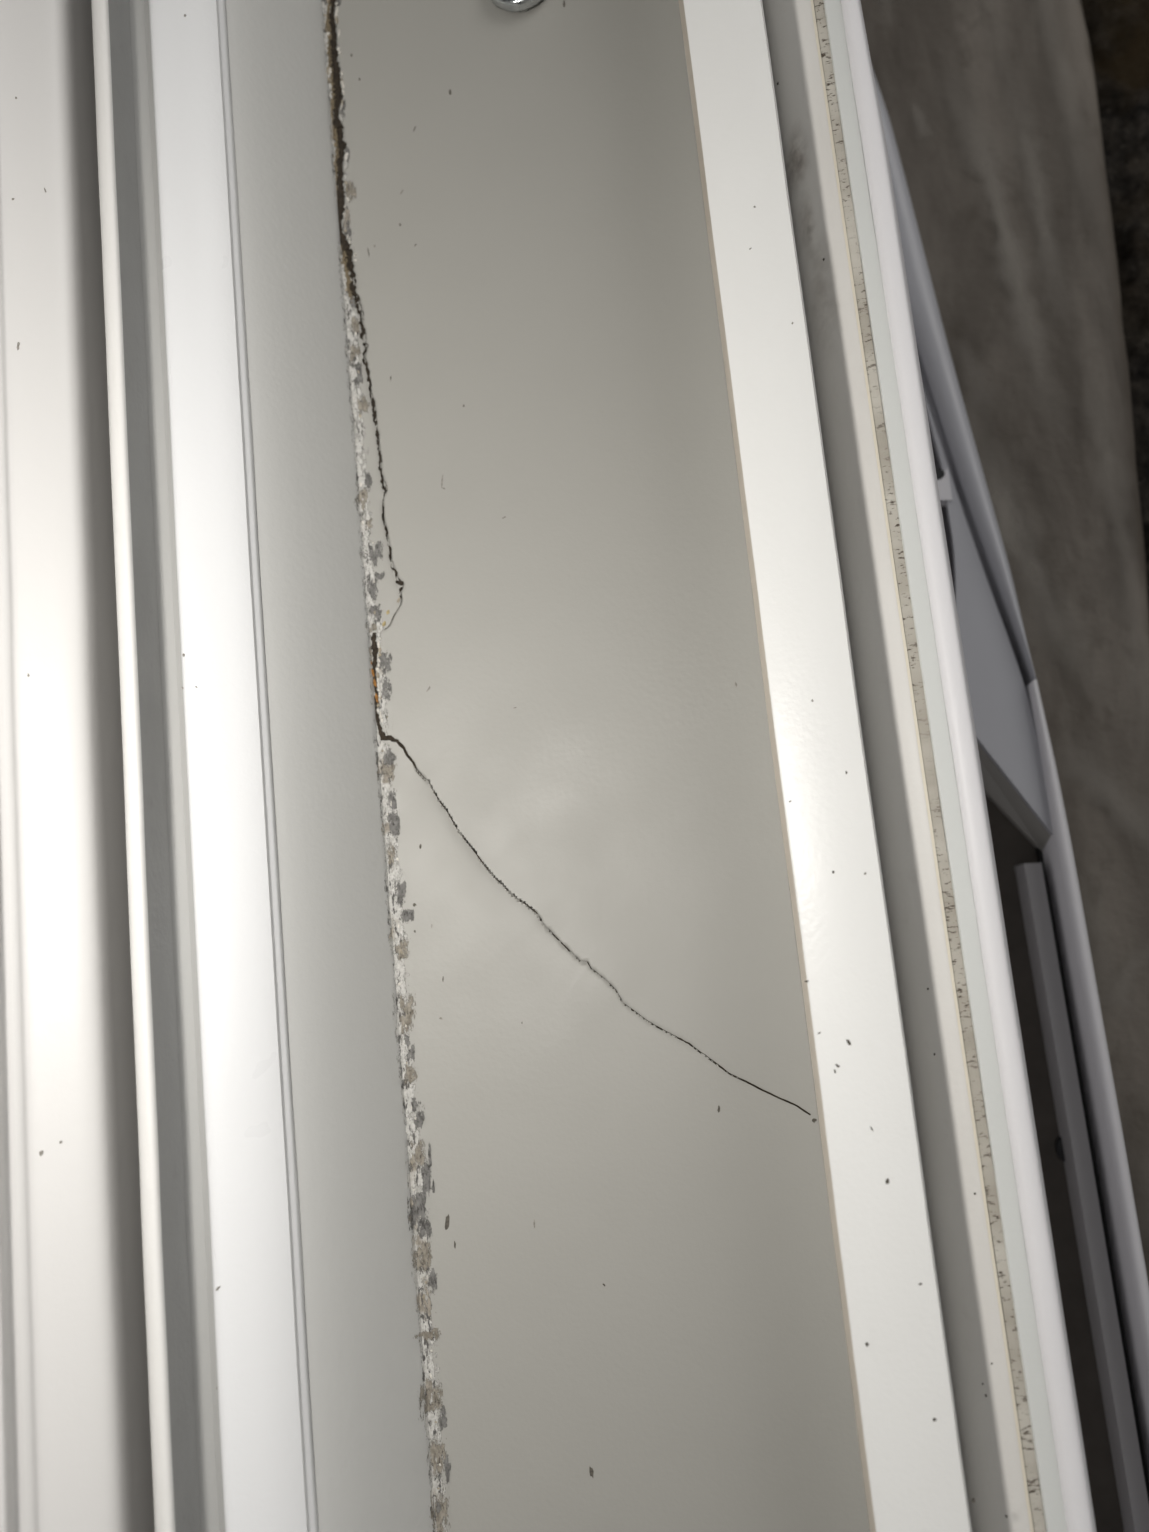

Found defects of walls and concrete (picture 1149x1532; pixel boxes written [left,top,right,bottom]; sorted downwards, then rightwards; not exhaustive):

peeling [322,0,451,1532]
crack [323,0,811,1115]